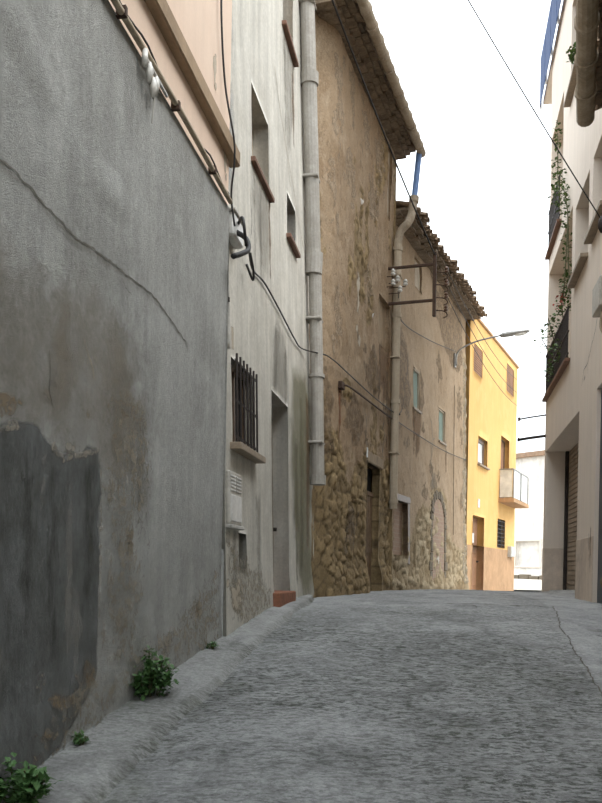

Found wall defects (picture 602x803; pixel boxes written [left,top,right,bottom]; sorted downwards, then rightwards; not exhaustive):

crack [0,159,188,345]
flaking render [323,369,369,456]
flaking render [436,288,469,583]
water stain [0,422,101,789]
crack [512,605,602,694]